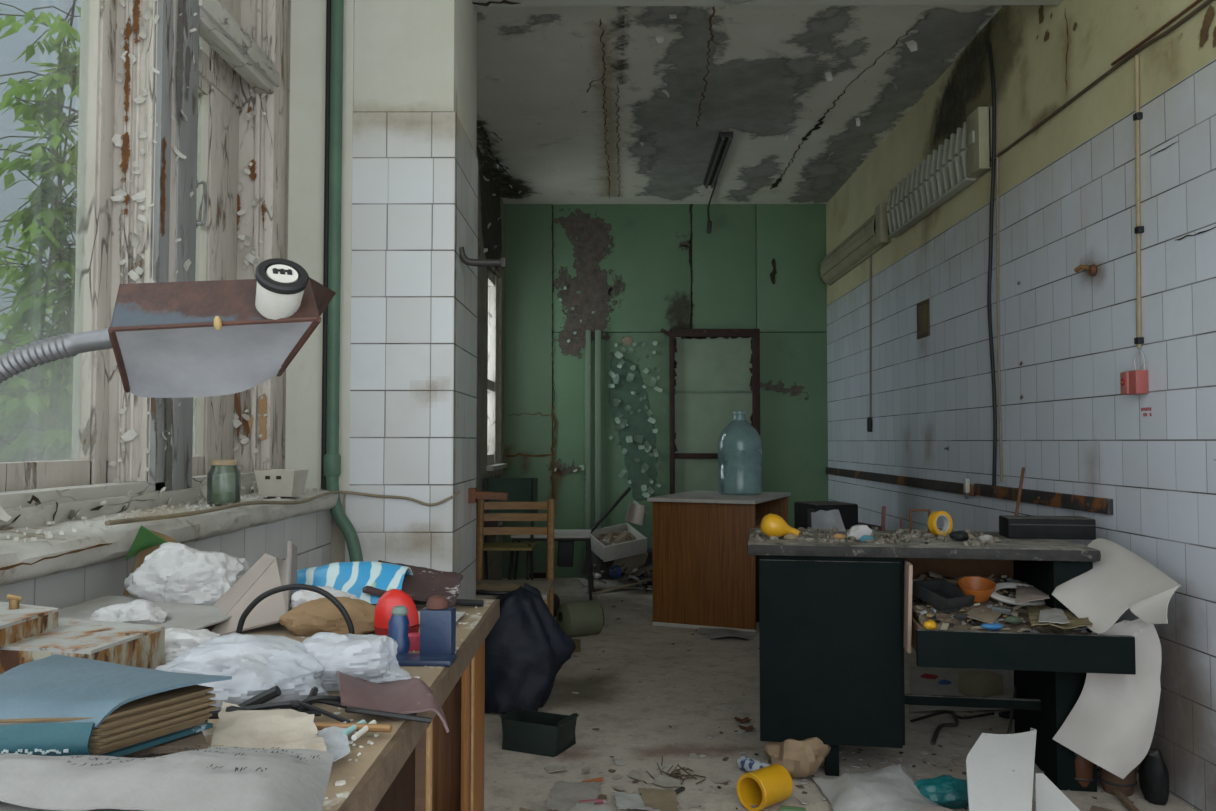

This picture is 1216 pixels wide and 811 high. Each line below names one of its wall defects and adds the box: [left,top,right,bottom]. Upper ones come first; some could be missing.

peeling [110,0,197,283]
peeling [236,159,266,269]
leakage [476,120,533,199]
crack [770,12,931,189]
leakage [789,6,1021,203]
peeling [554,209,663,504]
peeling [0,502,40,522]
peeling [109,407,150,510]
peeling [159,398,181,507]
peeling [232,394,270,470]